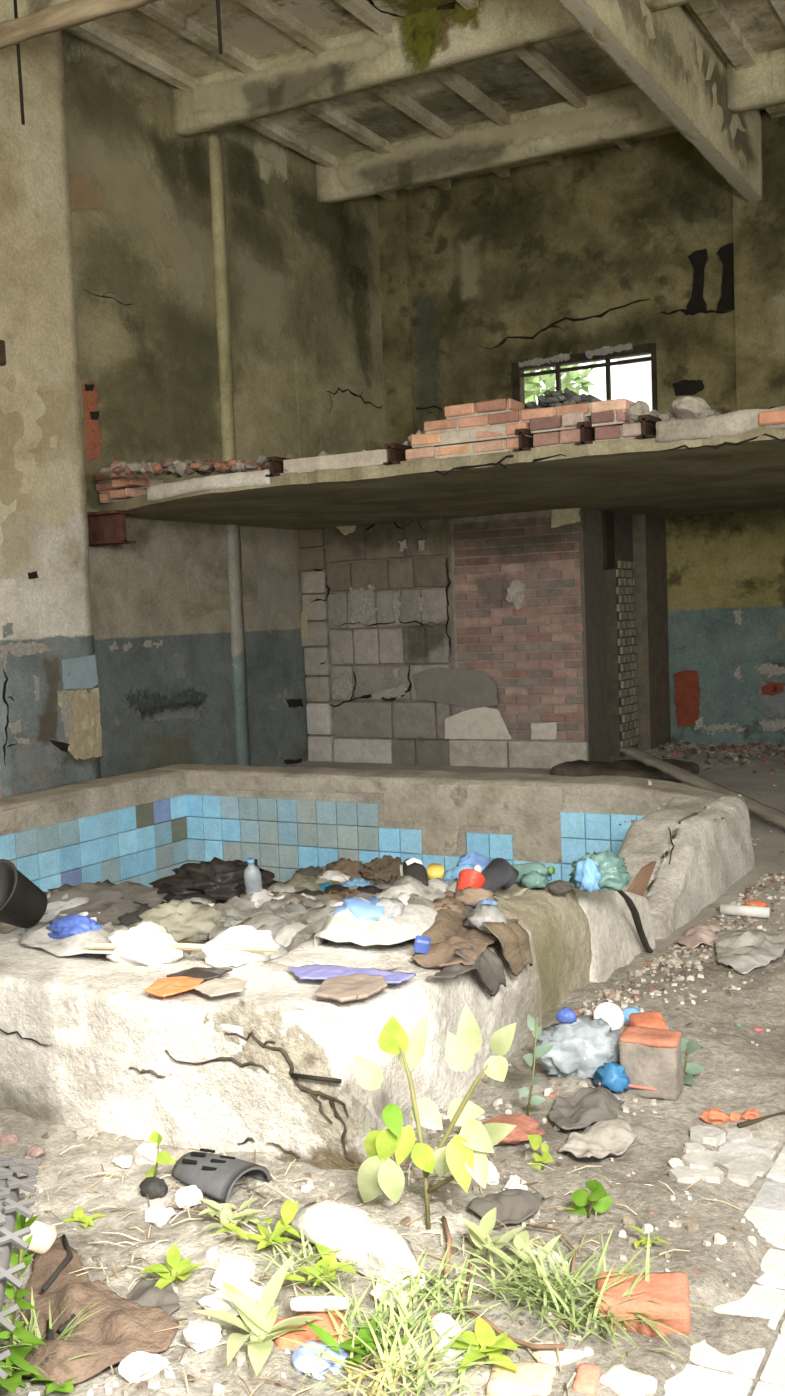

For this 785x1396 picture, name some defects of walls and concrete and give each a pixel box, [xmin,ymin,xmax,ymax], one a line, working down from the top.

damp [413,12,448,74]
crack [480,299,732,349]
flaking render [551,508,581,528]
spalling [0,639,163,760]
flaking render [445,707,511,740]
flaking render [531,722,557,740]
spalling [673,670,785,735]
peeling [734,662,785,696]
crack [667,827,675,865]
crack [128,1031,355,1163]